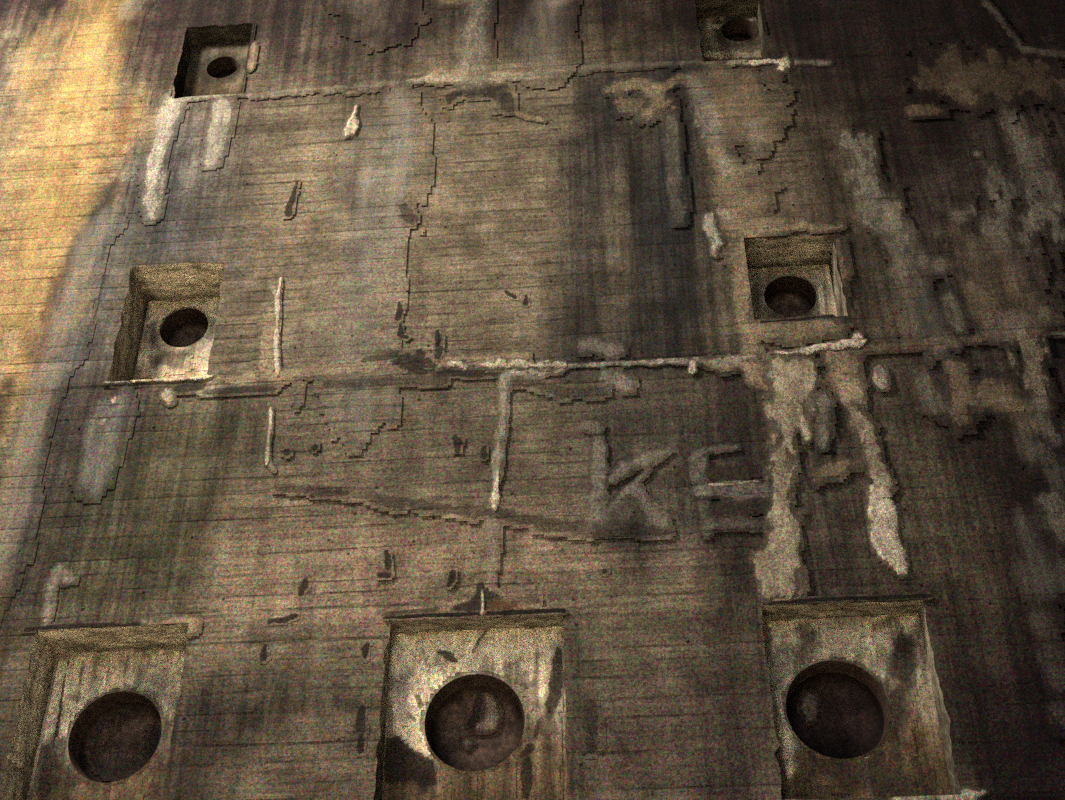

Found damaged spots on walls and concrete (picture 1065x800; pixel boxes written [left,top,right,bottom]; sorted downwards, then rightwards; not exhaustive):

corrosion [0,0,155,473]
water stain [0,0,1065,608]
water stain [38,560,80,624]